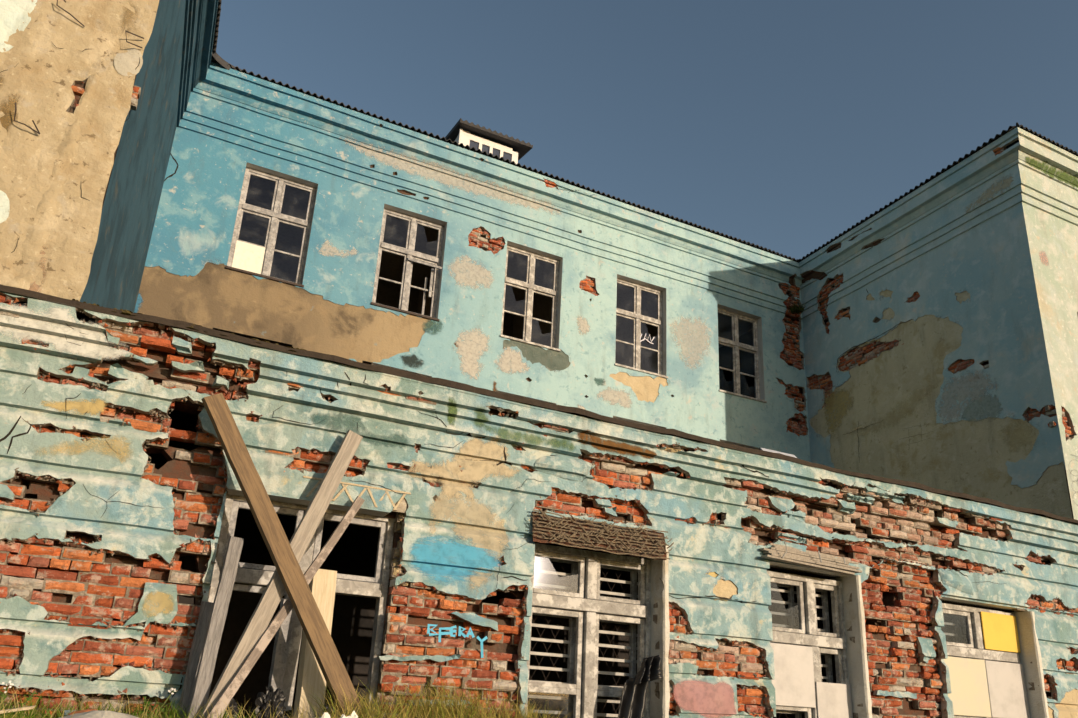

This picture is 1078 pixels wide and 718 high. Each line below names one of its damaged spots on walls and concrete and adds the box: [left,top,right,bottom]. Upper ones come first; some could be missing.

peeling [0,0,37,52]
peeling [0,190,10,223]
crack [0,384,32,454]
spalling [656,442,705,454]
peeling [0,262,437,718]
spalling [534,452,690,526]
spalling [675,512,728,528]
peeling [722,270,1078,718]
spalling [375,438,536,718]
peeling [706,572,737,601]
spalling [653,602,774,718]